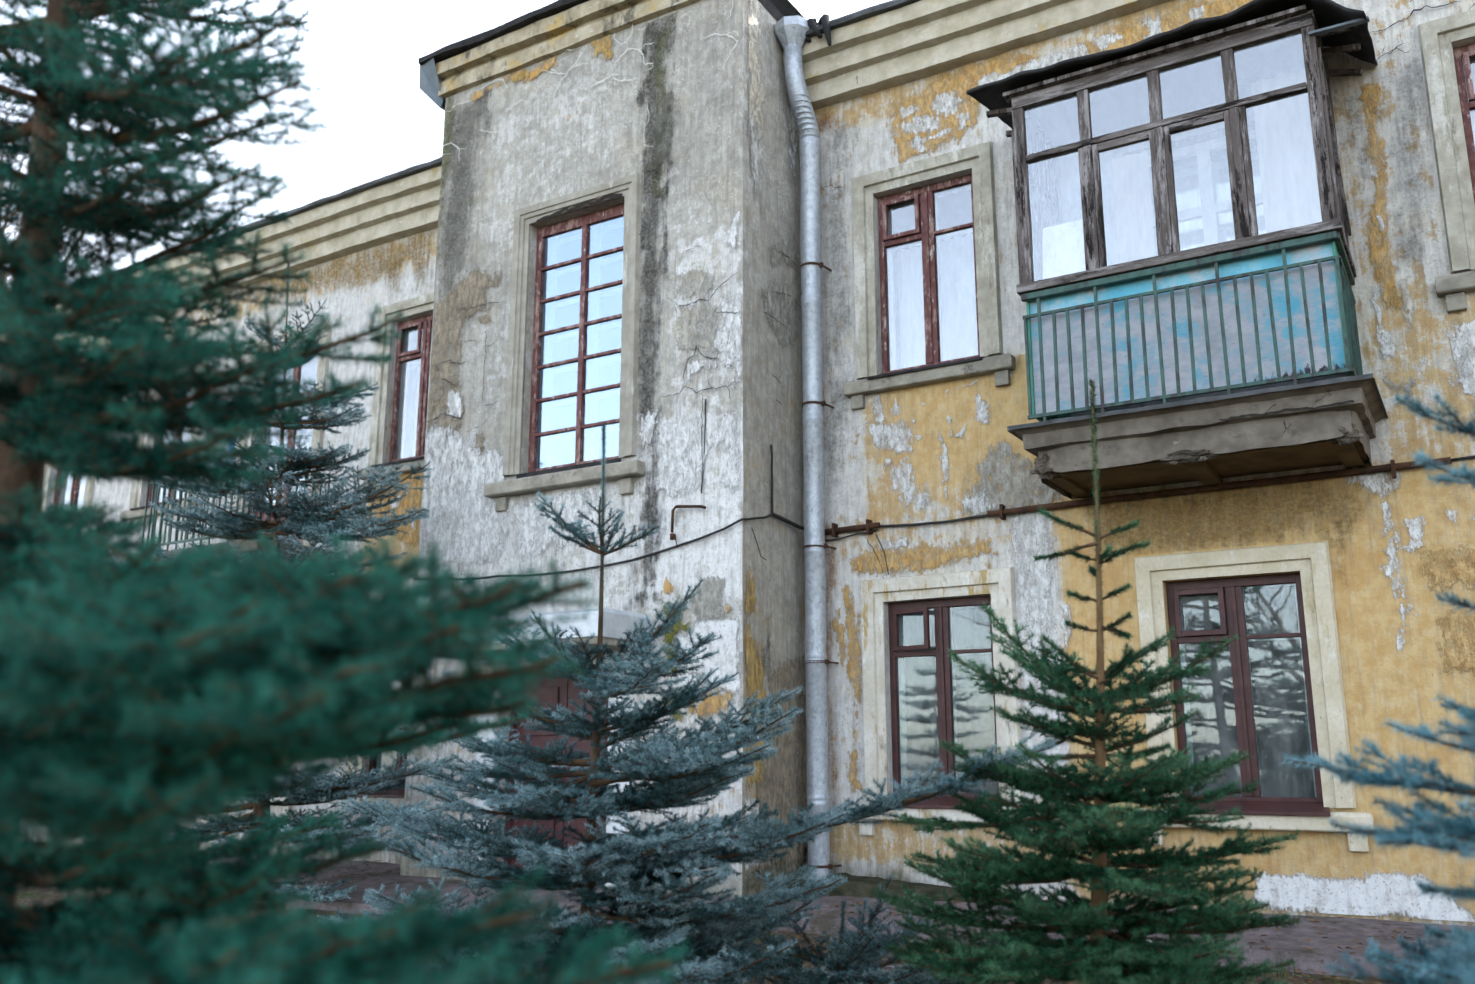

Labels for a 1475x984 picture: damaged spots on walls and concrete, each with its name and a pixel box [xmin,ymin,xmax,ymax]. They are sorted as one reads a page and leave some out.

peeling [886,0,1252,164]
crack [1369,0,1475,60]
damp [625,14,674,609]
flaking render [675,268,741,390]
flaking render [761,235,801,348]
peeling [1444,310,1475,401]
peeling [369,267,607,572]
peeling [636,407,741,500]
peeling [832,380,1073,728]
peeling [1344,464,1475,650]
peeling [1435,608,1475,675]
peeling [848,750,862,792]